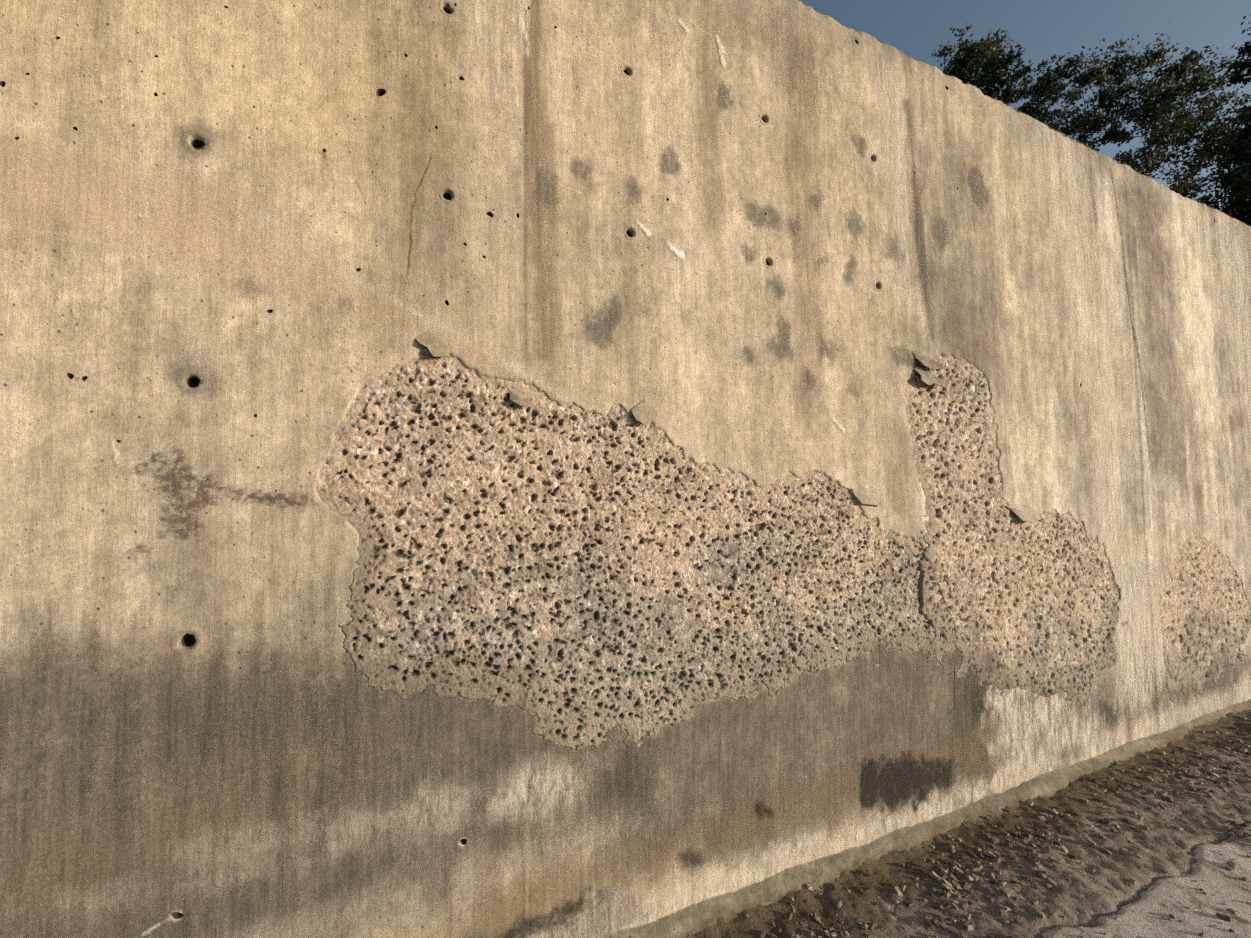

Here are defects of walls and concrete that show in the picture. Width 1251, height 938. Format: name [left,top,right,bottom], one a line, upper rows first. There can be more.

water stain [662,148,679,173]
water stain [882,71,946,295]
water stain [749,204,798,233]
water stain [587,299,621,344]
water stain [768,321,791,357]
water stain [890,348,919,366]
peeling [136,331,1127,754]
peeling [1159,537,1251,702]
water stain [0,545,1251,938]